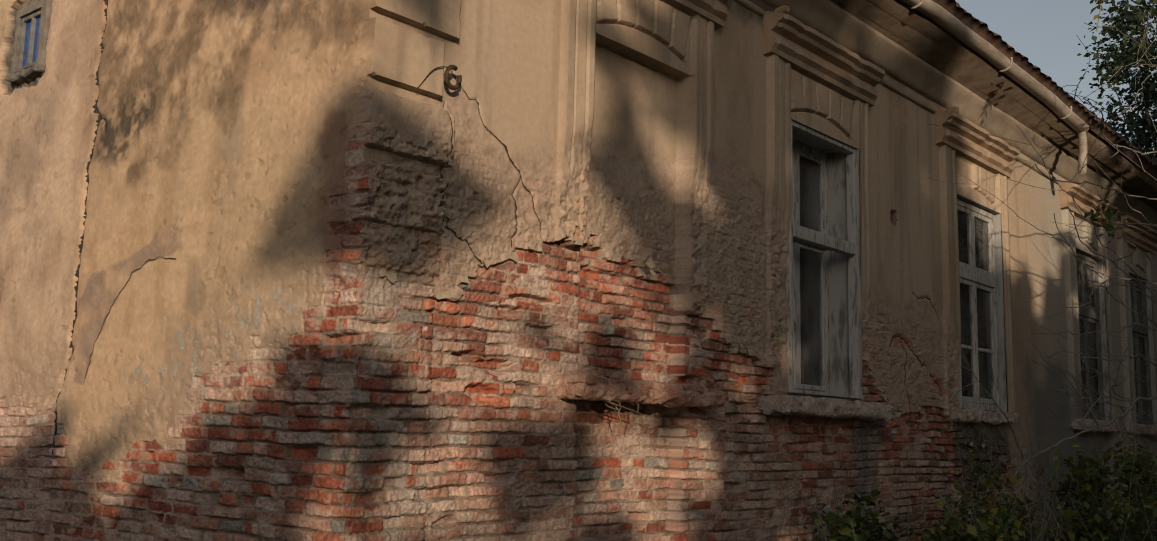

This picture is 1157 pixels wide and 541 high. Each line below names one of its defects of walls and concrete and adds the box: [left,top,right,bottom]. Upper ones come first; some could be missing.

crack [50,0,108,464]
crack [439,71,541,264]
spalling [0,74,1029,541]